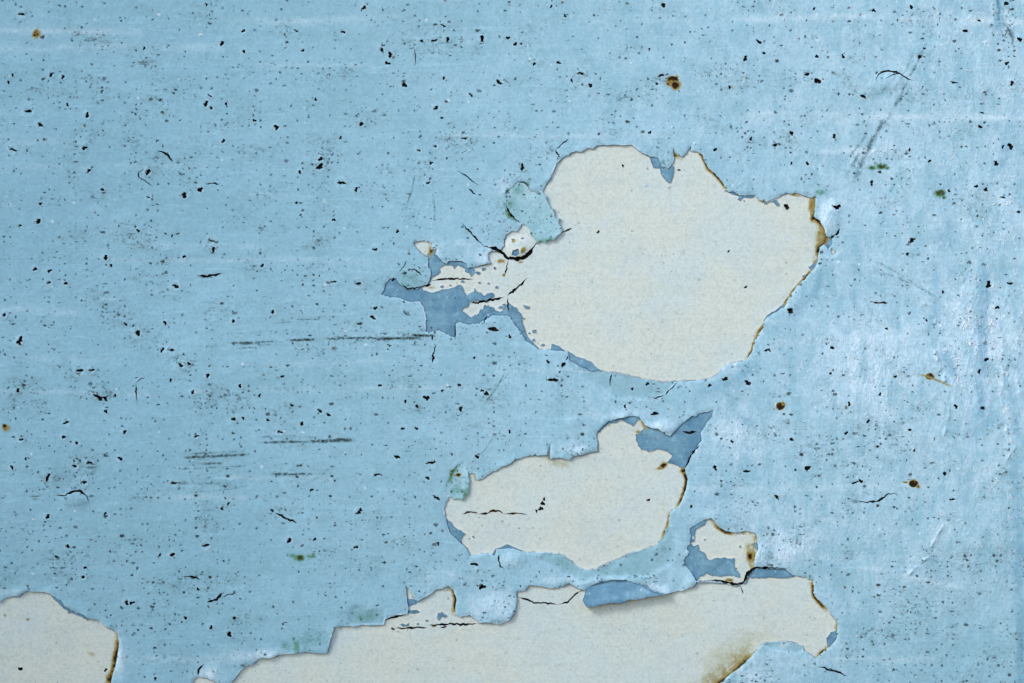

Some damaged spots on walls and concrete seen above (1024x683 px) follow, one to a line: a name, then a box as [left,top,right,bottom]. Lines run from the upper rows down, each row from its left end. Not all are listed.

rust [666,76,681,90]
crack [399,226,537,323]
peeling [382,145,836,383]
rust [783,193,829,305]
peeling [444,410,713,570]
rust [662,467,688,537]
peeling [0,591,118,683]
peeling [232,519,837,683]
crack [707,566,786,593]